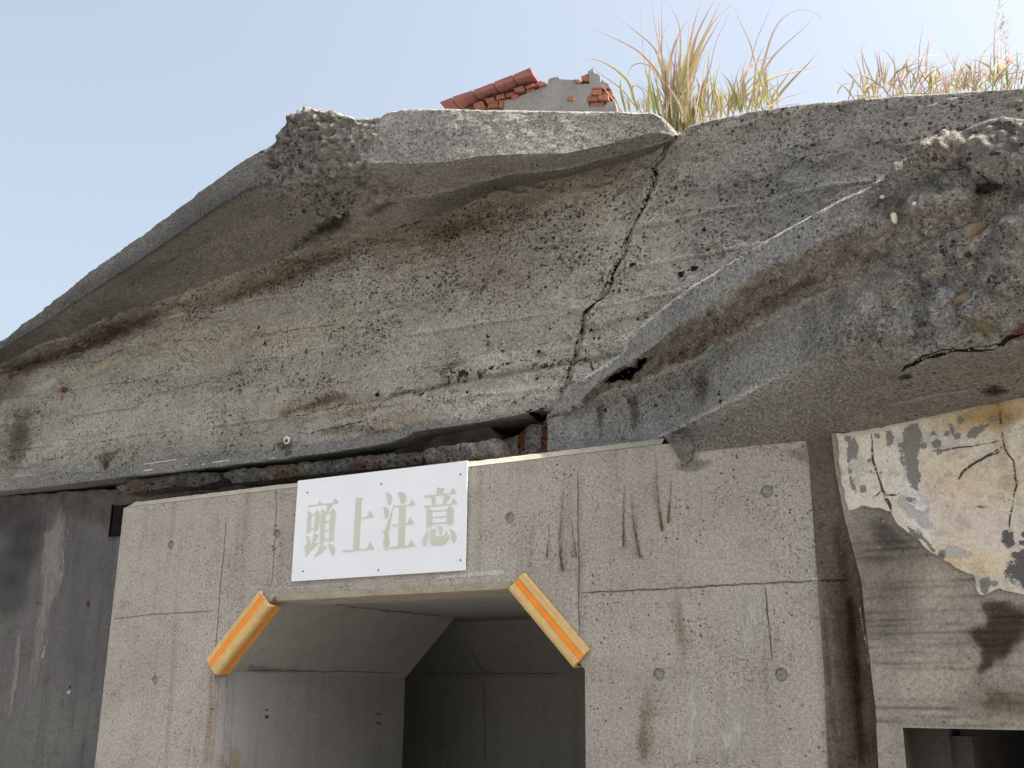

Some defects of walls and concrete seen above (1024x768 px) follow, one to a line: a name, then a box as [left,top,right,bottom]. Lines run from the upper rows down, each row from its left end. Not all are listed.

spalling [278,119,379,220]
crack [273,137,673,435]
crack [901,335,1022,372]
peeling [844,436,866,494]
peeling [874,416,996,559]
peeling [980,530,1024,594]
leakage [973,602,1024,670]